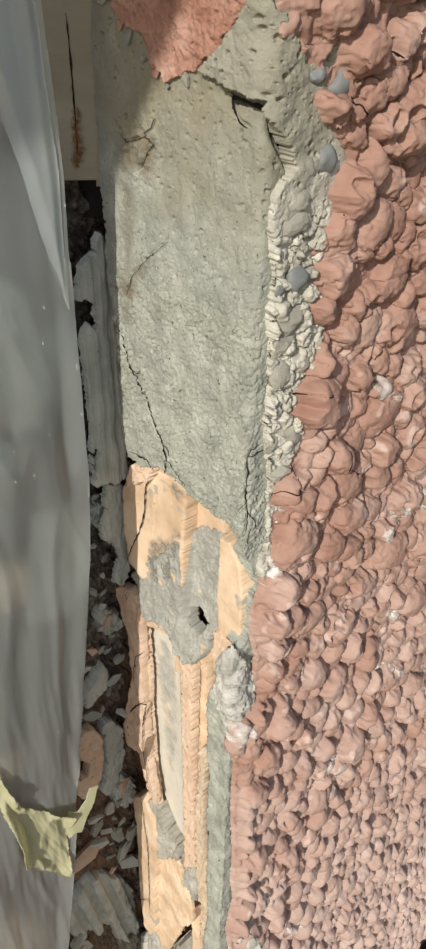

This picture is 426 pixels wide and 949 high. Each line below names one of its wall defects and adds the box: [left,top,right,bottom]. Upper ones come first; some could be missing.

rust [72,108,83,167]
crack [228,91,279,148]
crack [118,329,183,563]
spalling [74,0,350,949]
crack [244,445,308,536]
spalling [70,932,93,949]